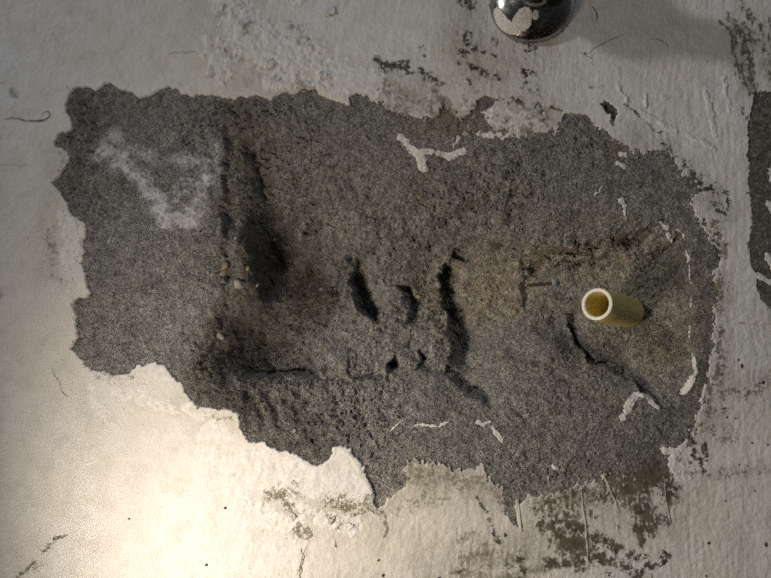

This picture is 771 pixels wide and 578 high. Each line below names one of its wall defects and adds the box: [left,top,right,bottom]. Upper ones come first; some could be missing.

leakage [718,0,771,96]
peeling [746,91,771,308]
spalling [52,53,721,538]
crack [571,327,666,417]
leakage [675,327,770,480]
leakage [264,480,313,541]
leakage [324,493,388,539]
leakage [453,459,680,578]